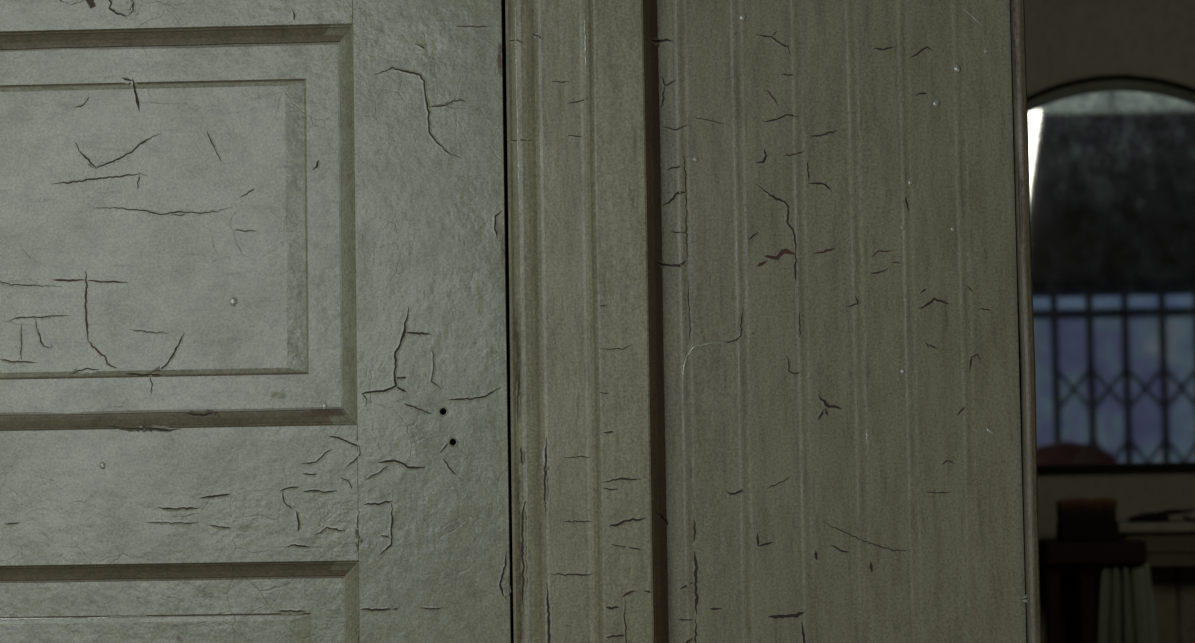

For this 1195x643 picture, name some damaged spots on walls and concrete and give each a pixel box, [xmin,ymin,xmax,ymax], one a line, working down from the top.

crack [52,77,283,244]
crack [374,43,466,159]
crack [551,79,589,139]
crack [657,76,755,344]
crack [748,31,858,282]
crack [874,45,933,58]
crack [0,271,185,394]
crack [786,311,804,376]
crack [108,410,217,432]
crack [280,435,457,555]
crack [354,306,722,643]
crack [817,395,842,421]